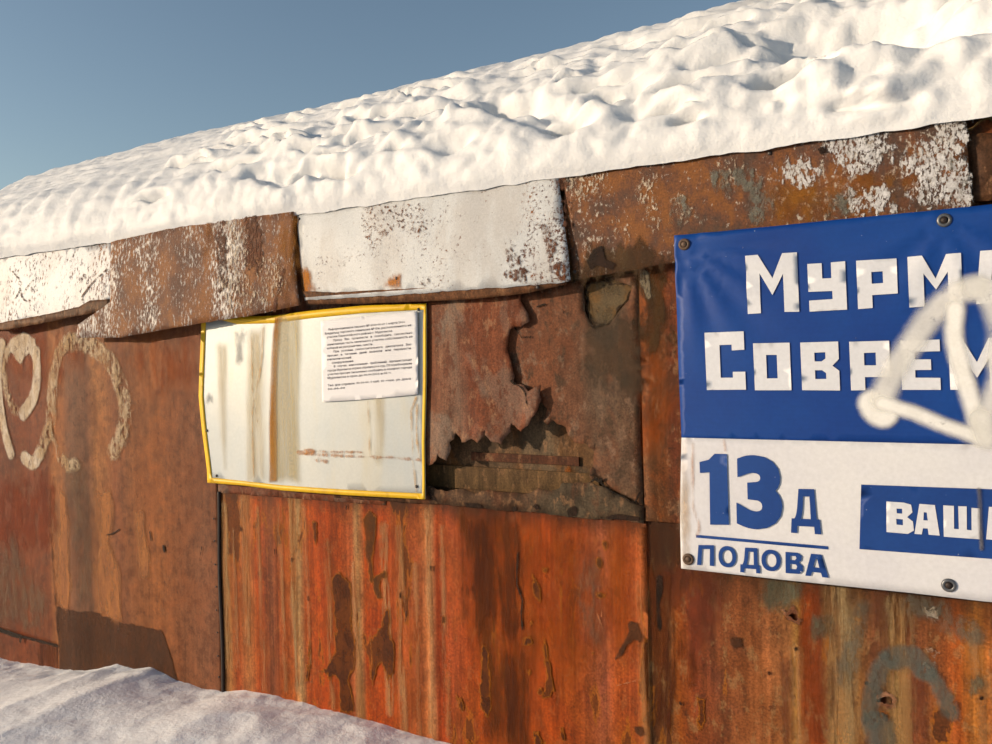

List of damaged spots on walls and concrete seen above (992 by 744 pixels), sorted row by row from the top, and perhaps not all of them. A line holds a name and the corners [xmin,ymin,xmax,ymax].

rust [845,175,876,206]
rust [207,220,228,293]
rust [242,215,266,276]
rust [57,490,70,611]
rust [93,491,122,622]
rust [281,498,431,732]
rust [478,645,492,718]
rust [460,506,554,698]
rust [505,655,542,744]
rust [615,568,675,733]
rust [832,664,853,744]